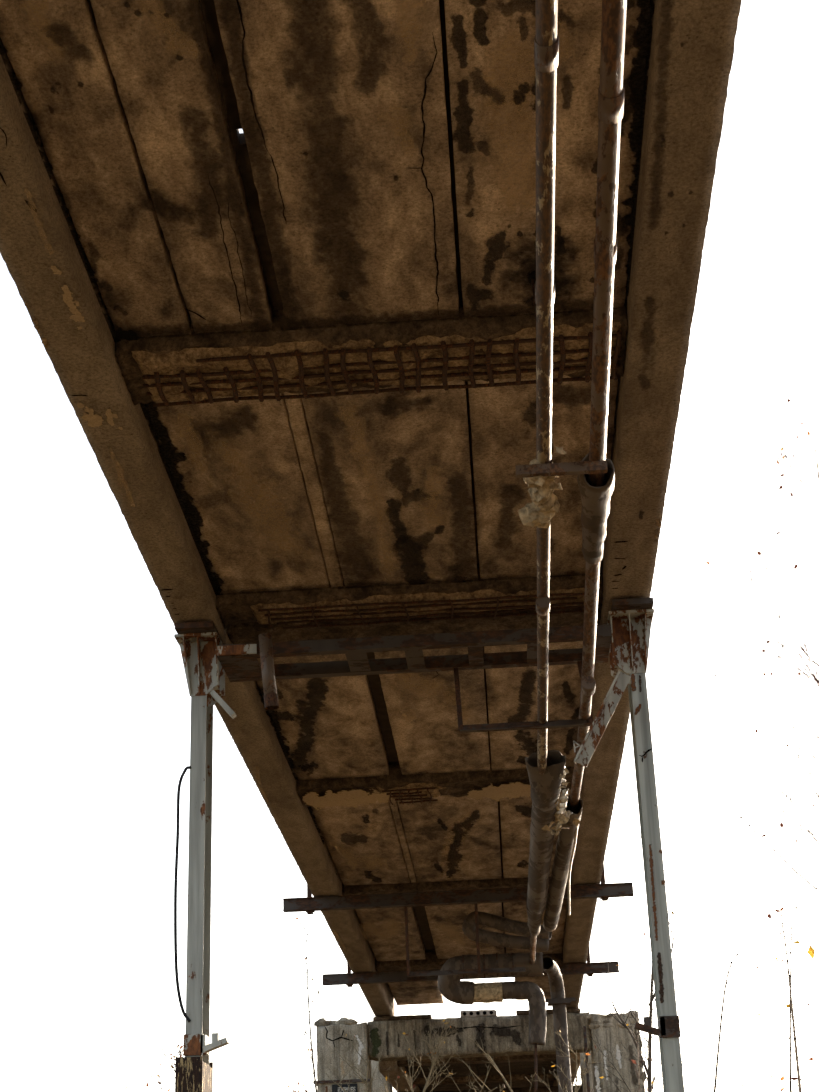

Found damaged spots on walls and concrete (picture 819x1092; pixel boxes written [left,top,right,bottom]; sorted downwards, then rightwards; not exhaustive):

damp [624,26,637,55]
damp [620,78,637,137]
damp [114,0,536,338]
crack [413,32,439,306]
damp [554,226,567,255]
damp [614,213,630,280]
spalling [131,327,536,407]
spalling [552,323,593,384]
spalling [609,322,622,380]
damp [386,457,477,585]
spalling [303,783,446,810]
spalling [467,782,531,802]